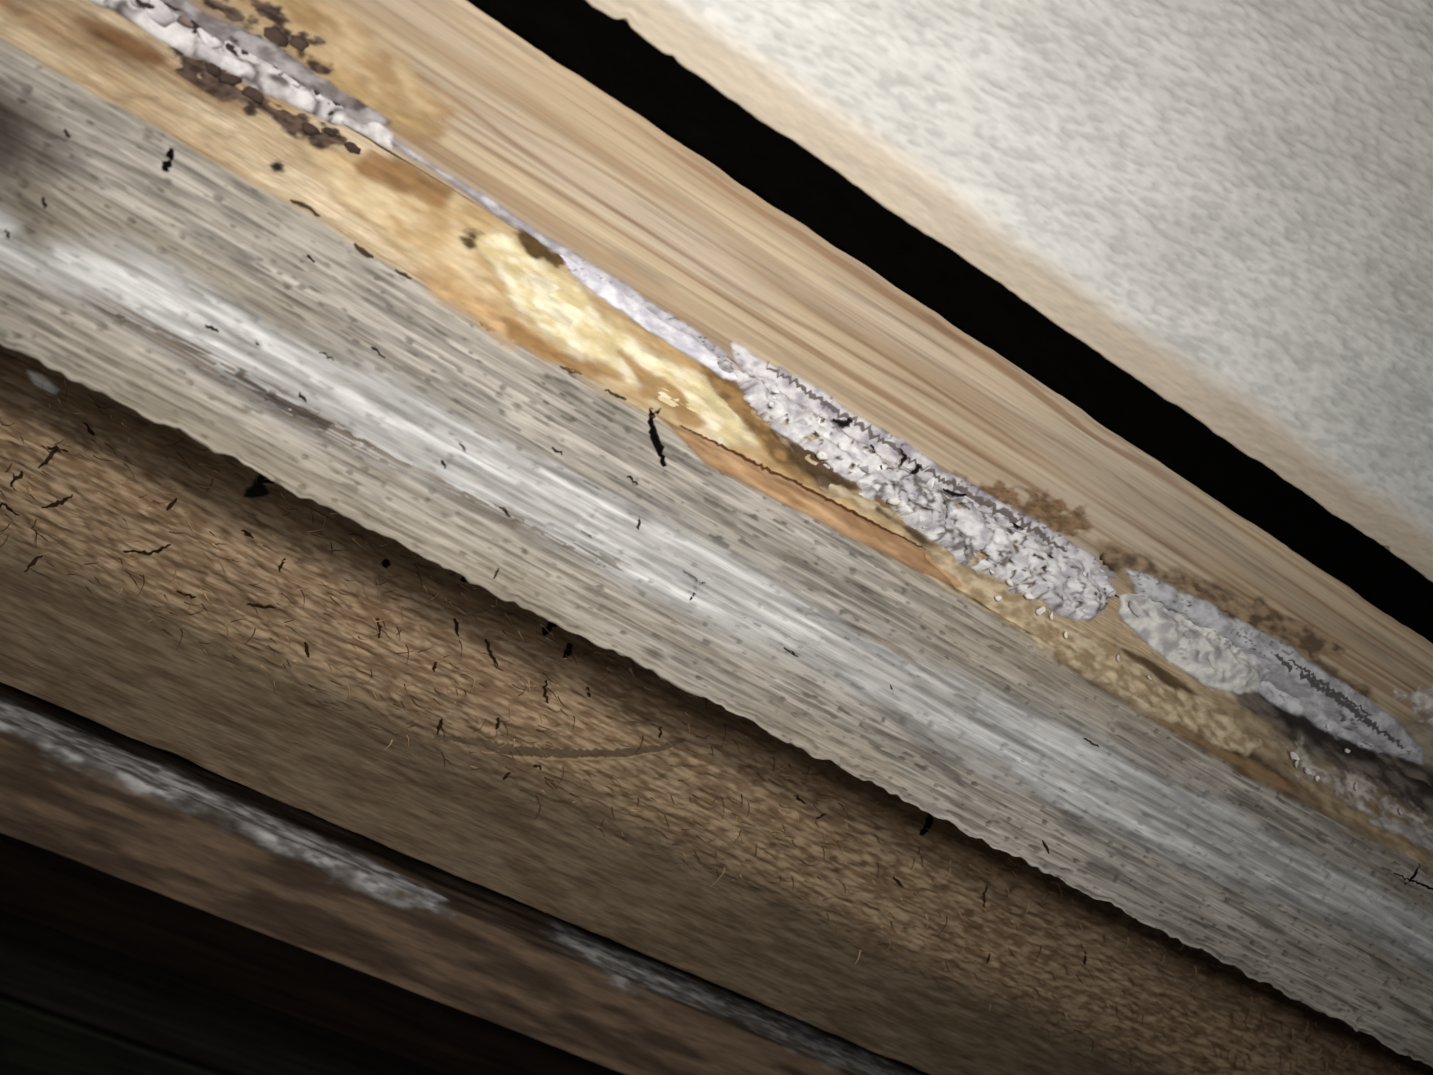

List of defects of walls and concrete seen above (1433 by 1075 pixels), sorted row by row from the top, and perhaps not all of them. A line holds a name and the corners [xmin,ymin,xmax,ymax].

water stain [0,0,237,106]
peeling [206,63,264,105]
peeling [265,27,309,51]
peeling [302,99,361,155]
water stain [92,0,1433,871]
water stain [0,696,447,913]
water stain [549,923,913,1075]